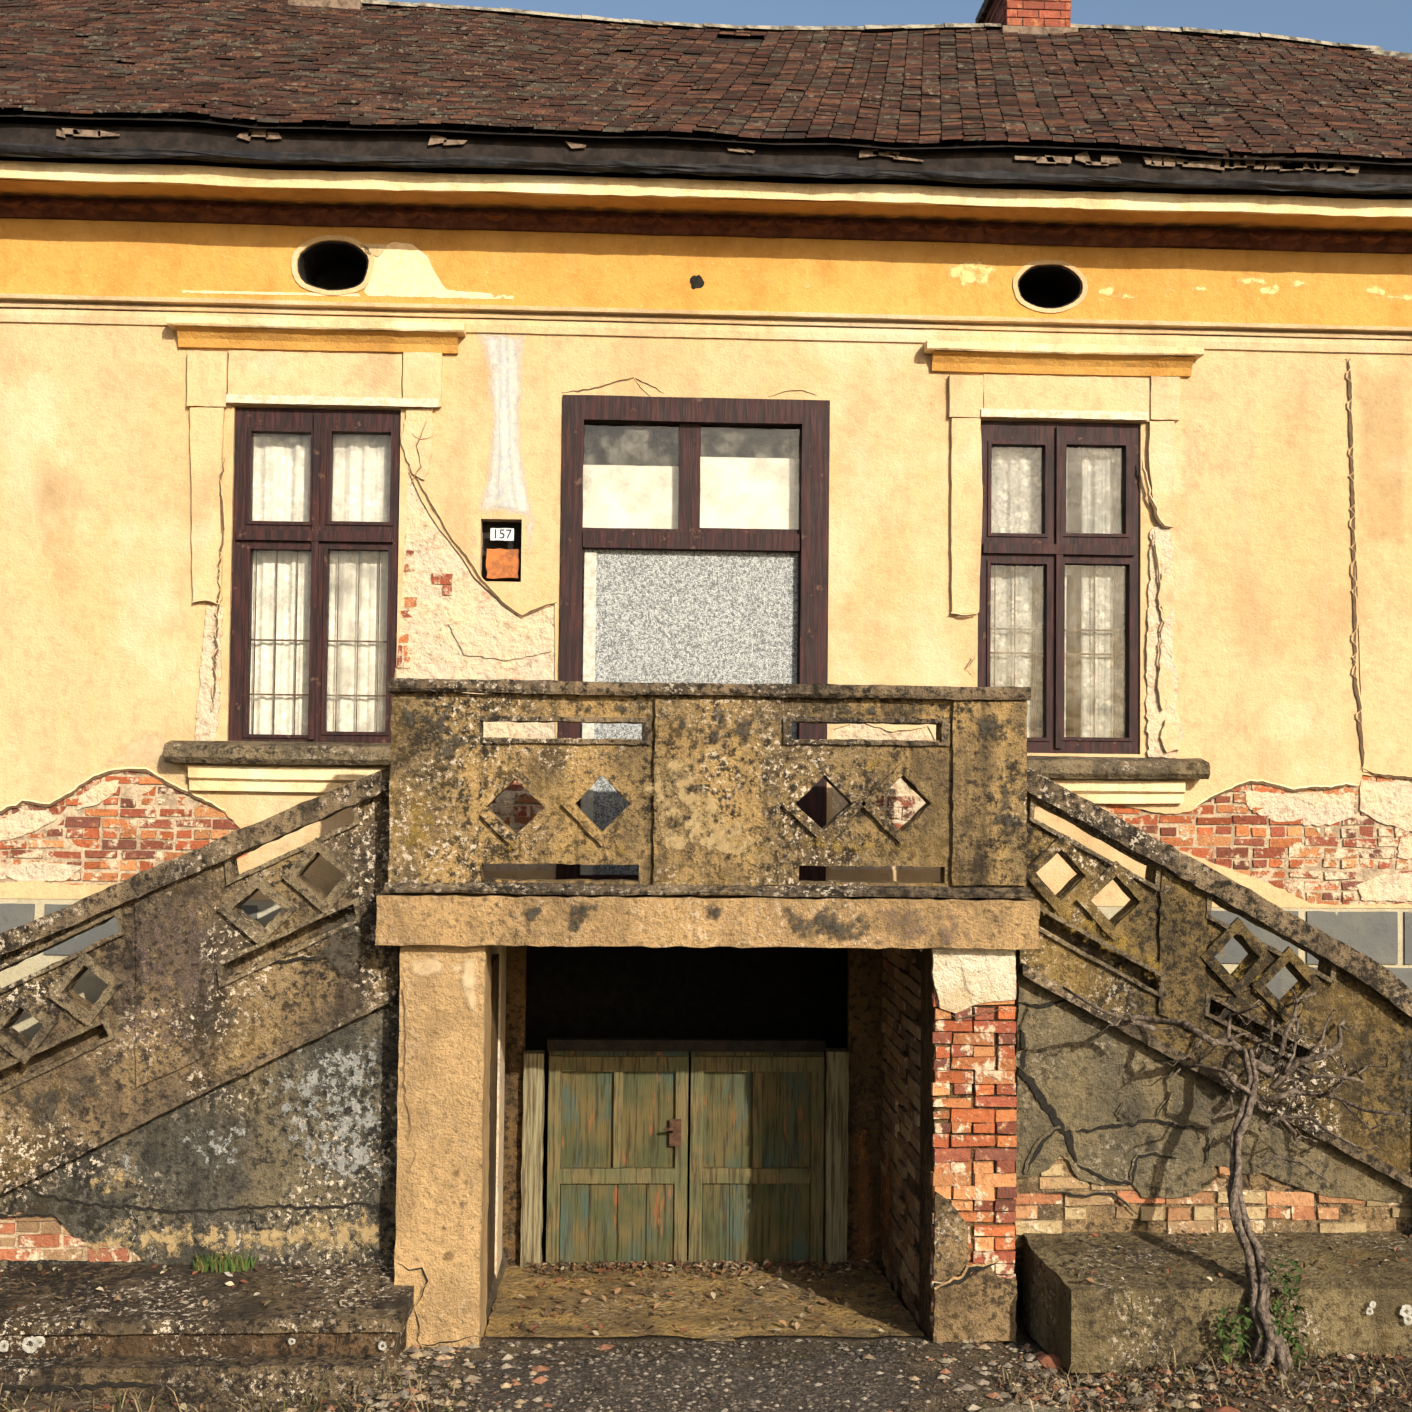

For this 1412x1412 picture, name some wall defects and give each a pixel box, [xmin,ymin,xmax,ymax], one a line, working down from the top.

peeling [182,242,514,299]
peeling [395,467,557,694]
crack [1142,459,1174,708]
crack [1346,357,1412,779]
leakage [709,703,763,745]
spalling [0,733,240,886]
spalling [1100,775,1412,909]
leakage [782,900,879,939]
leakage [183,1122,245,1173]
leakage [269,1038,391,1180]
crack [943,961,1220,1215]
spalling [930,969,1412,1328]